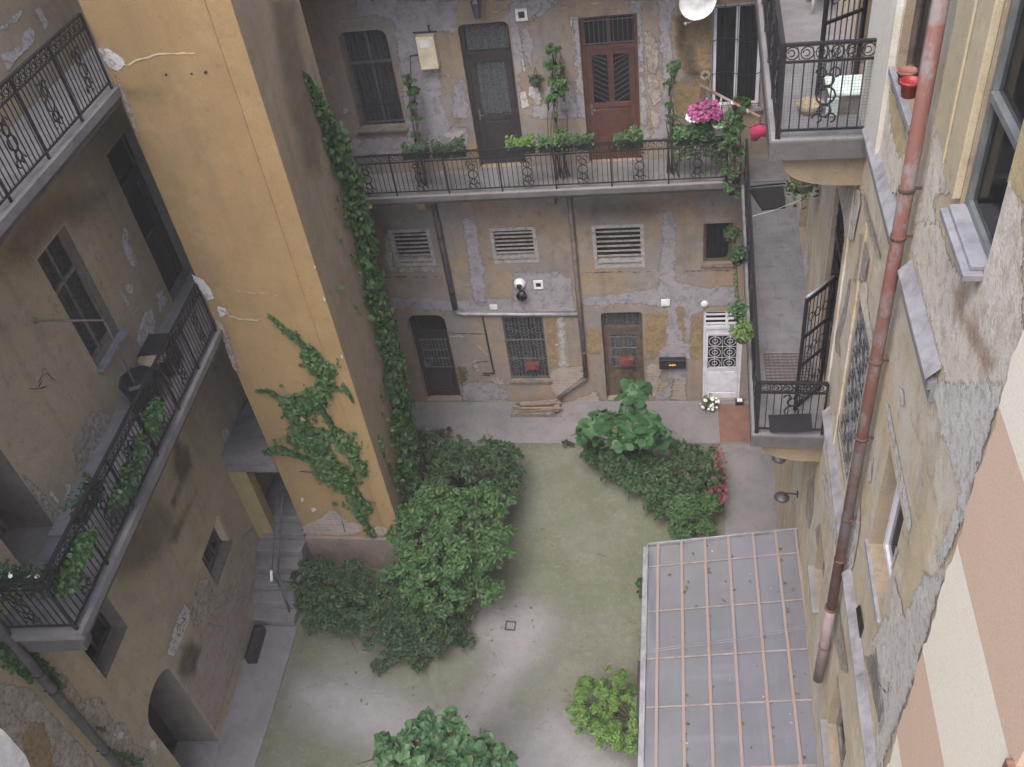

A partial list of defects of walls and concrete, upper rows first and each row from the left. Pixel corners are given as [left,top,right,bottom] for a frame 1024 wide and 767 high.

peeling [0,6,49,72]
flaking render [98,47,138,132]
crack [126,52,195,66]
peeling [519,86,541,109]
peeling [137,290,168,347]
flaking render [191,274,239,373]
peeling [644,306,703,401]
flaking render [864,119,1024,767]
flaking render [300,497,388,537]
peeling [834,601,848,673]